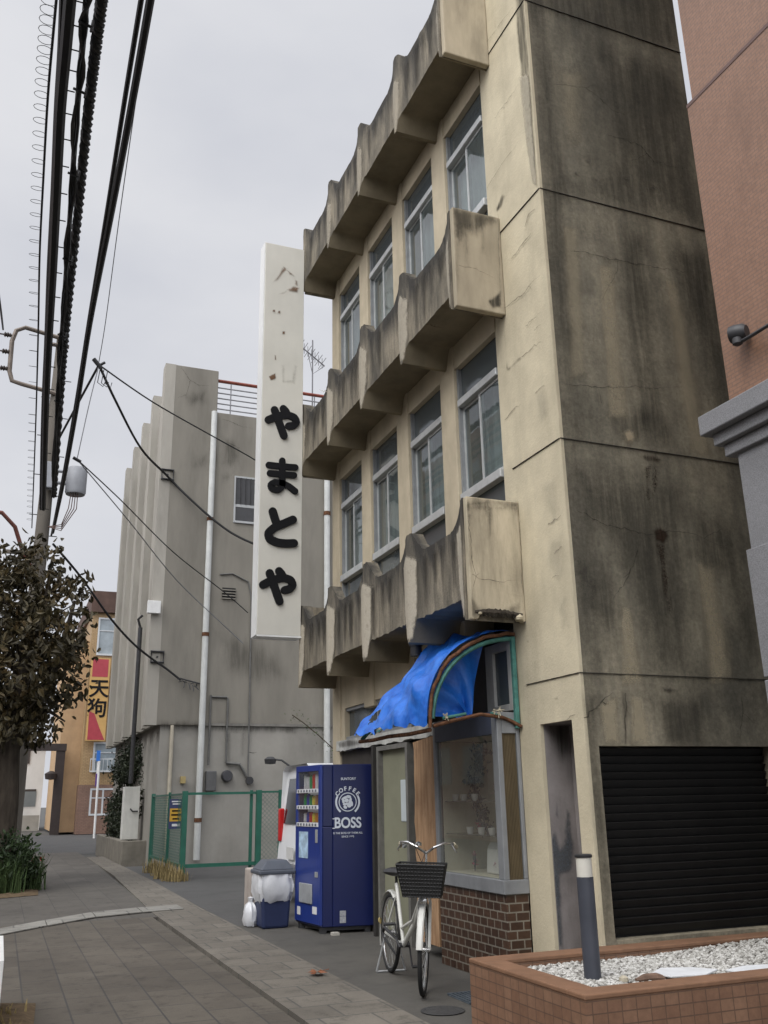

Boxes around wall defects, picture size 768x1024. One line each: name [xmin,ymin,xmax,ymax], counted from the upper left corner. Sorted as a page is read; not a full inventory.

leakage [518,0,526,67]
leakage [455,208,487,235]
leakage [552,815,572,944]